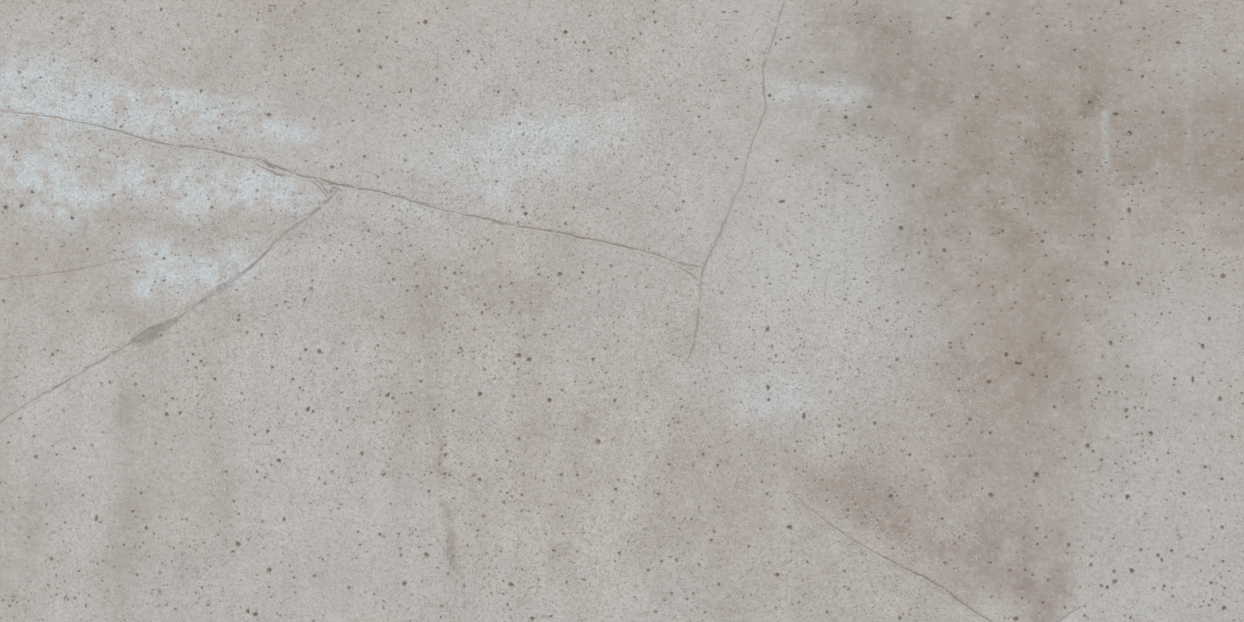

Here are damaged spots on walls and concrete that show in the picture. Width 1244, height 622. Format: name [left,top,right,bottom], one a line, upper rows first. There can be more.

leakage [0,13,385,317]
crack [0,0,786,426]
leakage [384,91,663,229]
leakage [745,50,907,149]
leakage [956,81,1167,225]
crack [788,492,995,622]